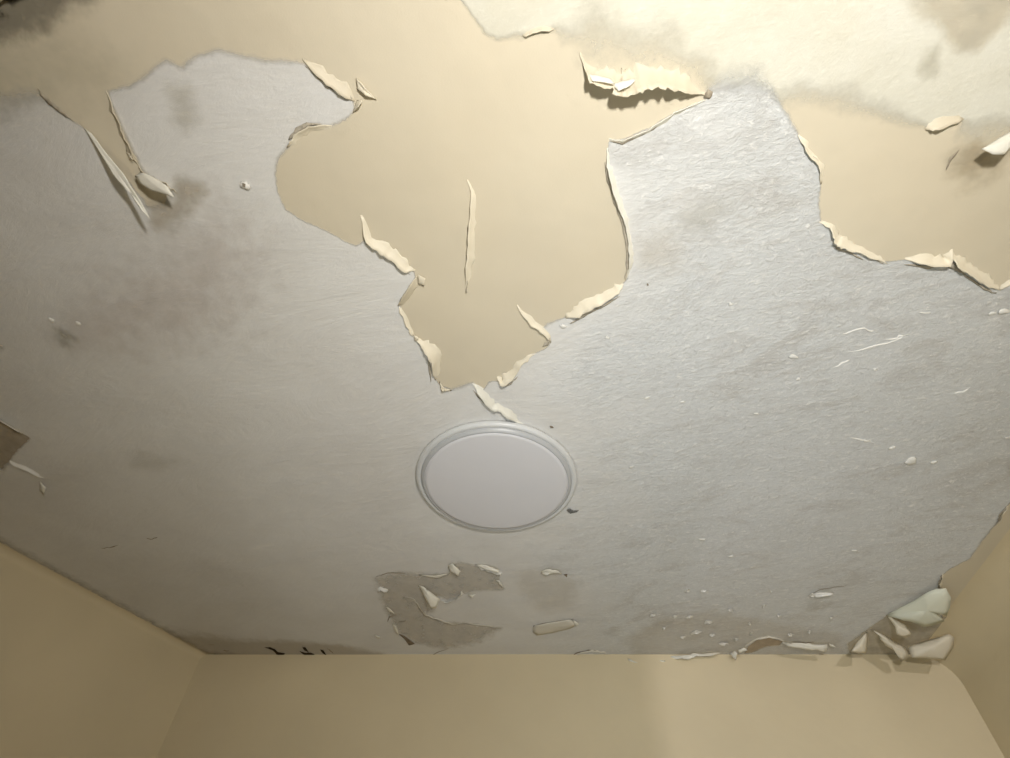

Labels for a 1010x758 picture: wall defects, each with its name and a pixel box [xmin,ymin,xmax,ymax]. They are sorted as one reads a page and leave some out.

mould [0,0,64,34]
peeling [462,0,1010,132]
peeling [0,51,1010,654]